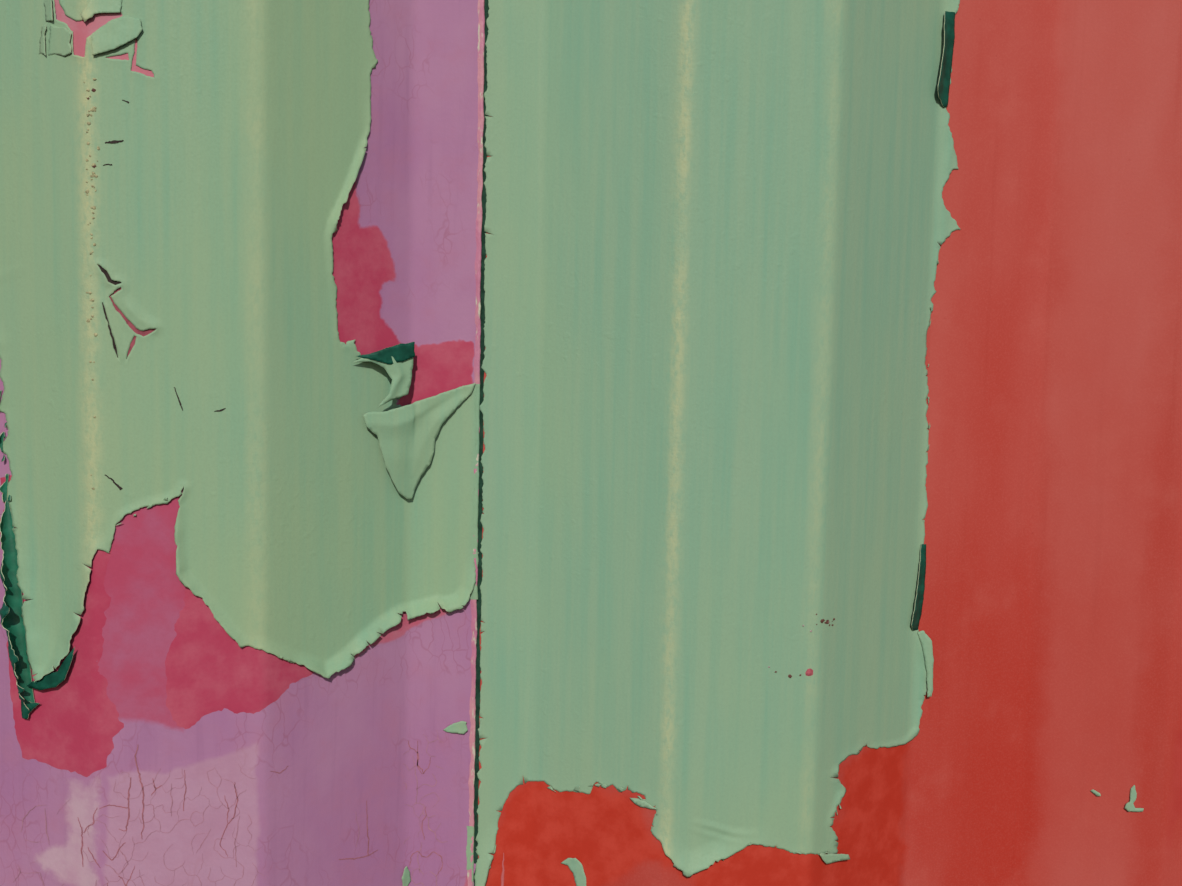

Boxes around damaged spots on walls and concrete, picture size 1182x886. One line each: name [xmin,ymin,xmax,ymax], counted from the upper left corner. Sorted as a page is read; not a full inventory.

crack [98,265,157,358]
peeling [0,0,480,719]
peeling [466,0,961,886]
crack [1,744,288,886]
peeling [25,736,265,886]
peeling [402,866,411,886]
peeling [444,721,468,734]
peeling [1125,785,1144,812]